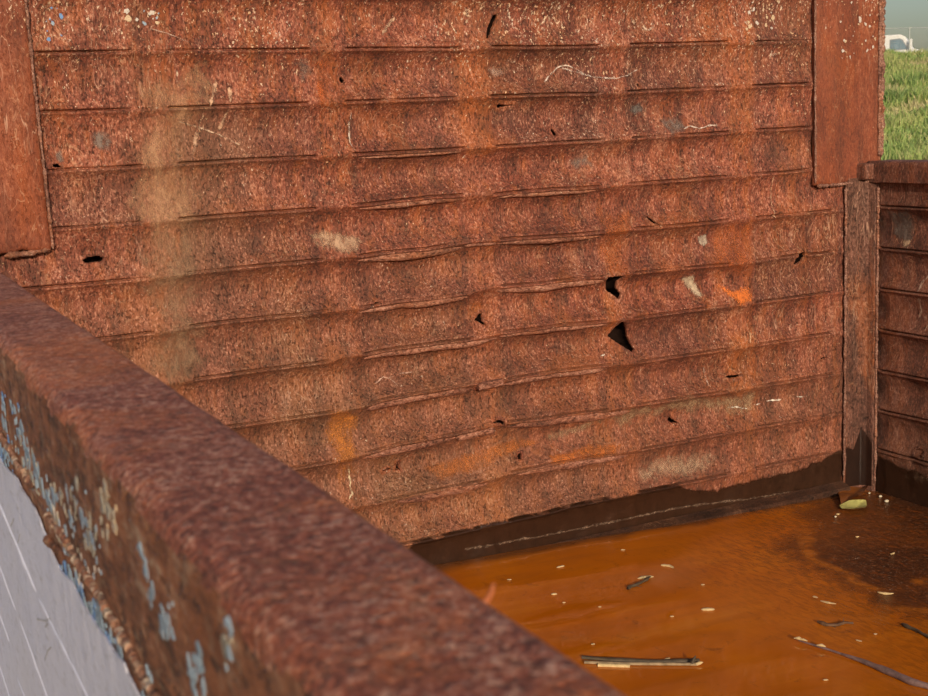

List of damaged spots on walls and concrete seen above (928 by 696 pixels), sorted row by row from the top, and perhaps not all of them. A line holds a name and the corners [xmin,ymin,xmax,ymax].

peeling [745,0,779,30]
corrosion [718,285,751,304]
peeling [0,391,123,659]
water stain [409,429,928,566]
peeling [137,542,175,641]
peeling [186,640,206,696]
peeling [221,615,233,672]